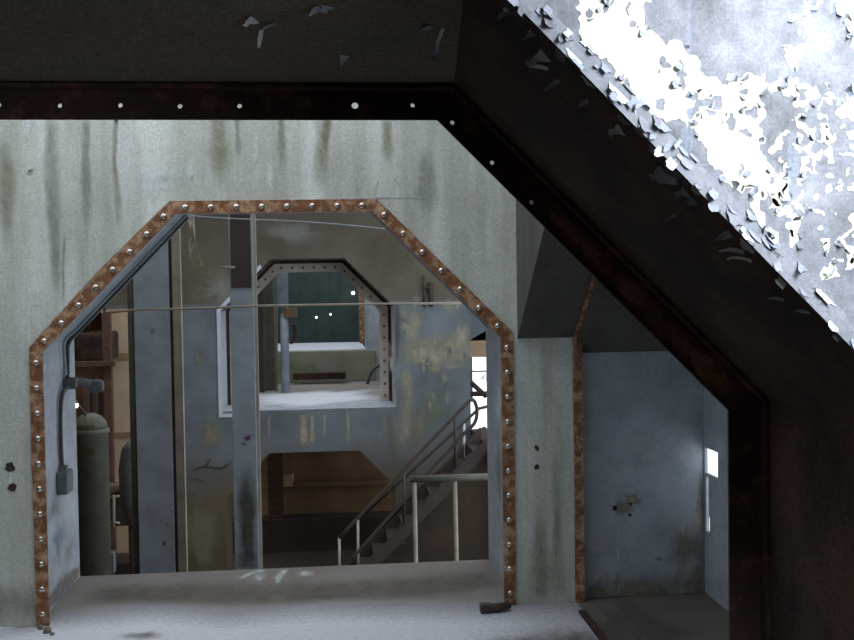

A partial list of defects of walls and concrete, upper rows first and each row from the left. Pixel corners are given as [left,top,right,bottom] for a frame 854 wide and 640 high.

peeling [243,16,276,48]
peeling [309,5,334,17]
peeling [497,0,854,307]
damp [49,189,58,267]
corrosion [44,215,156,331]
peeling [403,314,467,382]
peeling [828,321,854,349]
corrosion [240,482,255,567]